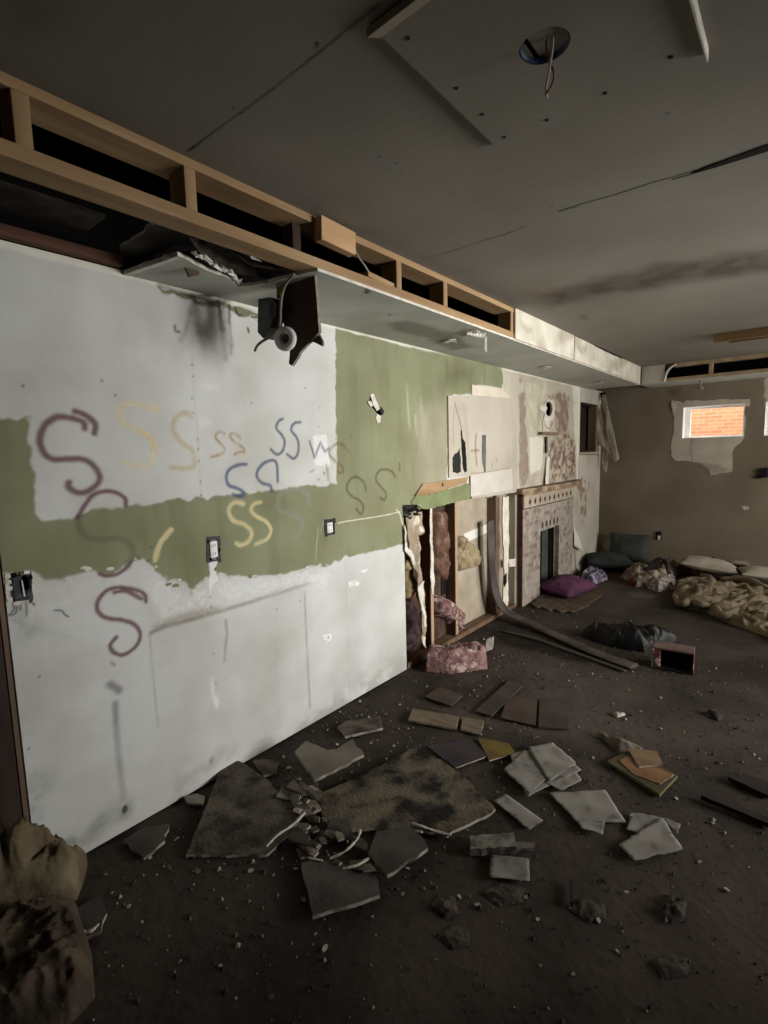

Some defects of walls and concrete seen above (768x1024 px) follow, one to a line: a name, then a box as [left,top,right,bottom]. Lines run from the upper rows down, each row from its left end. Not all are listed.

crack [559,163,714,212]
damp [192,295,230,330]
flaking render [519,392,589,515]
flaking render [671,399,750,476]
peeling [4,572,34,606]
peeling [64,555,157,582]
spalling [206,536,232,577]